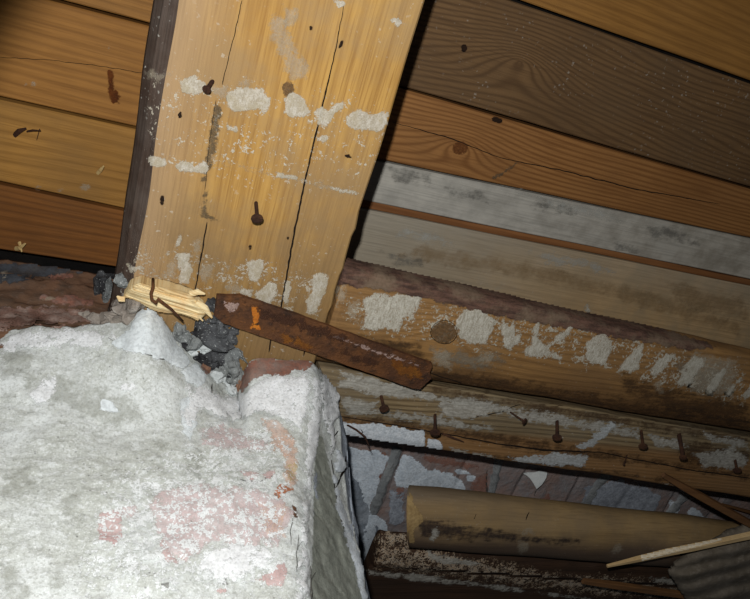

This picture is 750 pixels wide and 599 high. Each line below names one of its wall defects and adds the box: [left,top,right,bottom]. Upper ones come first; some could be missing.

crack [222,1,242,85]
crack [322,5,344,107]
crack [393,122,717,204]
crack [195,223,207,290]
crack [280,125,319,308]
corrosion [250,307,261,330]